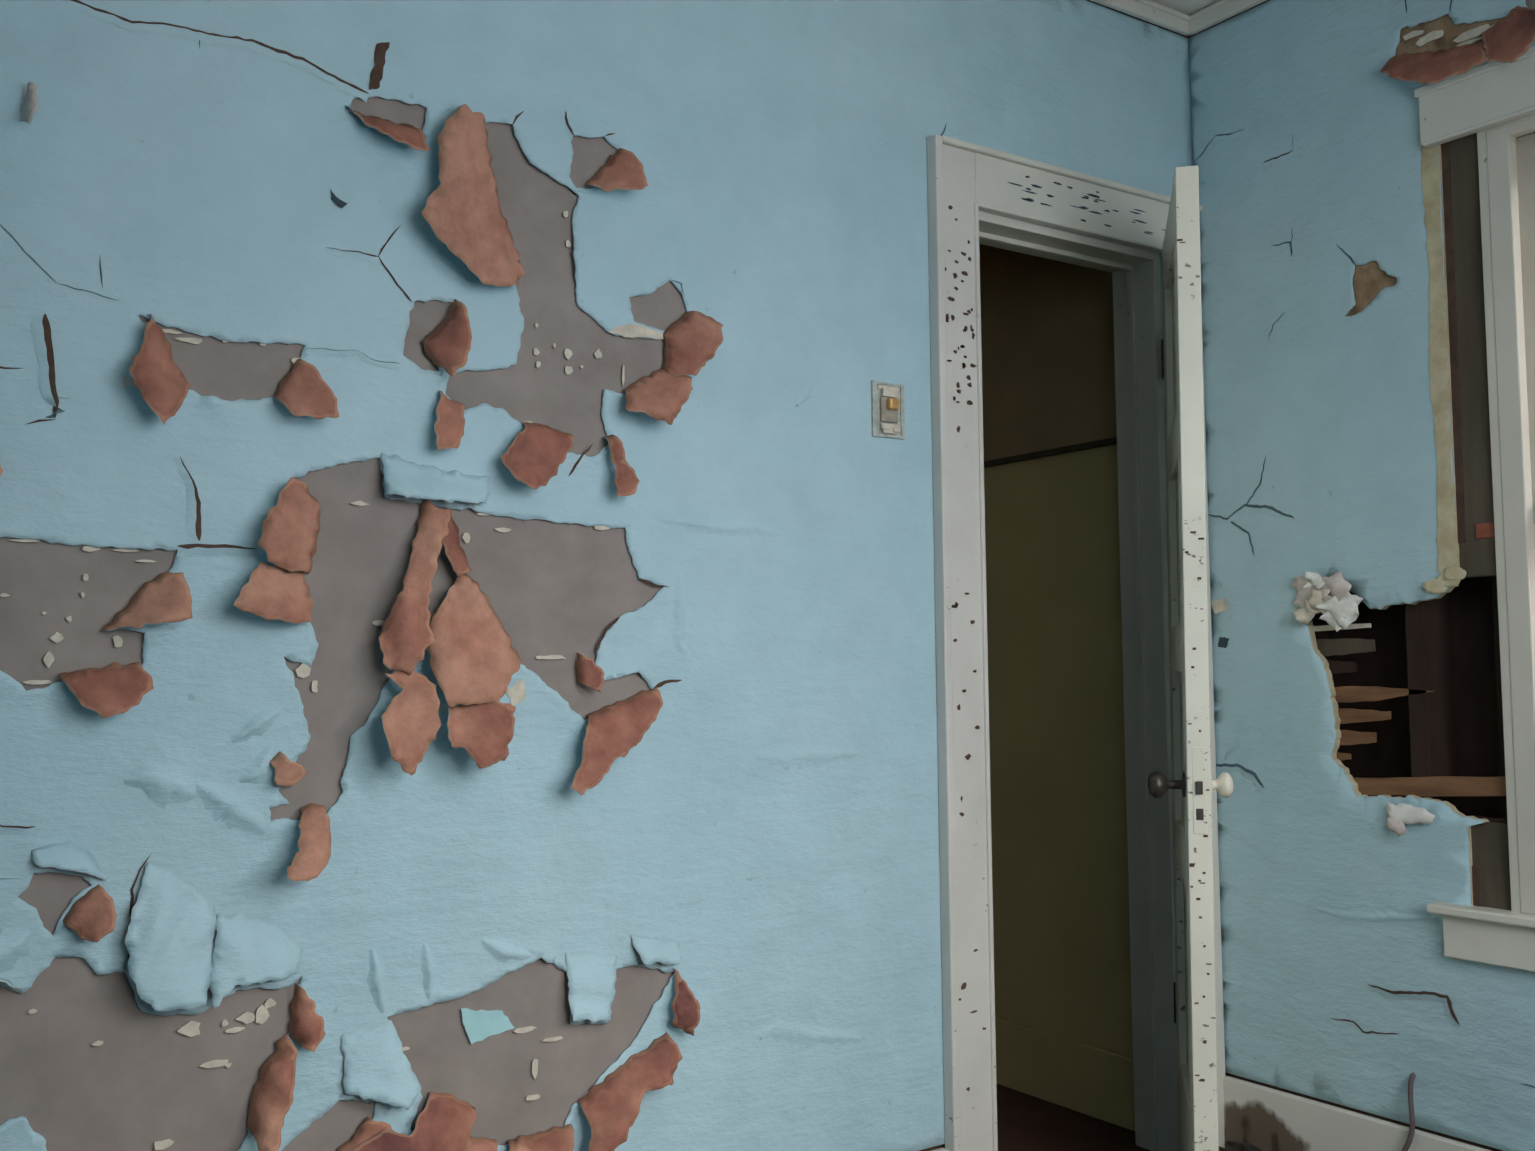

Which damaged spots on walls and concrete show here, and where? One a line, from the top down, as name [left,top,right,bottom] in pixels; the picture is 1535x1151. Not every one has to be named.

crack [49,0,369,102]
peeling [1380,0,1535,85]
peeling [123,313,339,425]
peeling [233,42,723,882]
crack [1208,455,1294,556]
spalling [1292,144,1508,906]
peeling [0,537,193,719]
peeling [0,840,701,1151]
crack [1332,984,1460,1034]